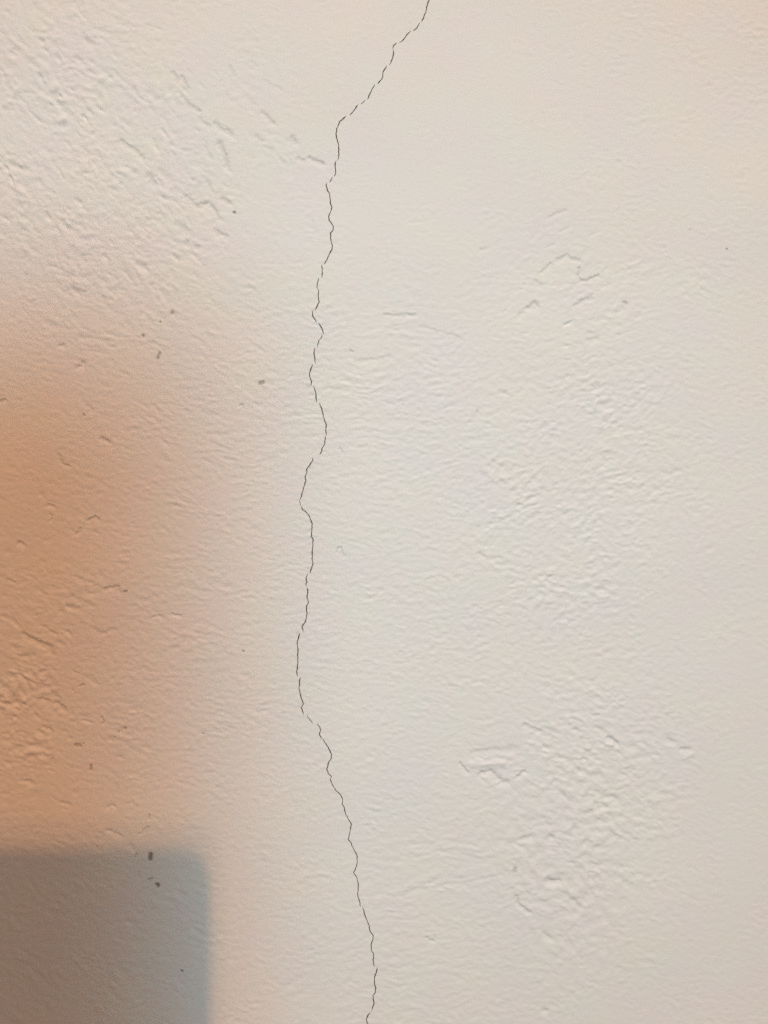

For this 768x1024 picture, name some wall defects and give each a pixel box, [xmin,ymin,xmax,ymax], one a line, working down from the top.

crack [296,0,430,1024]